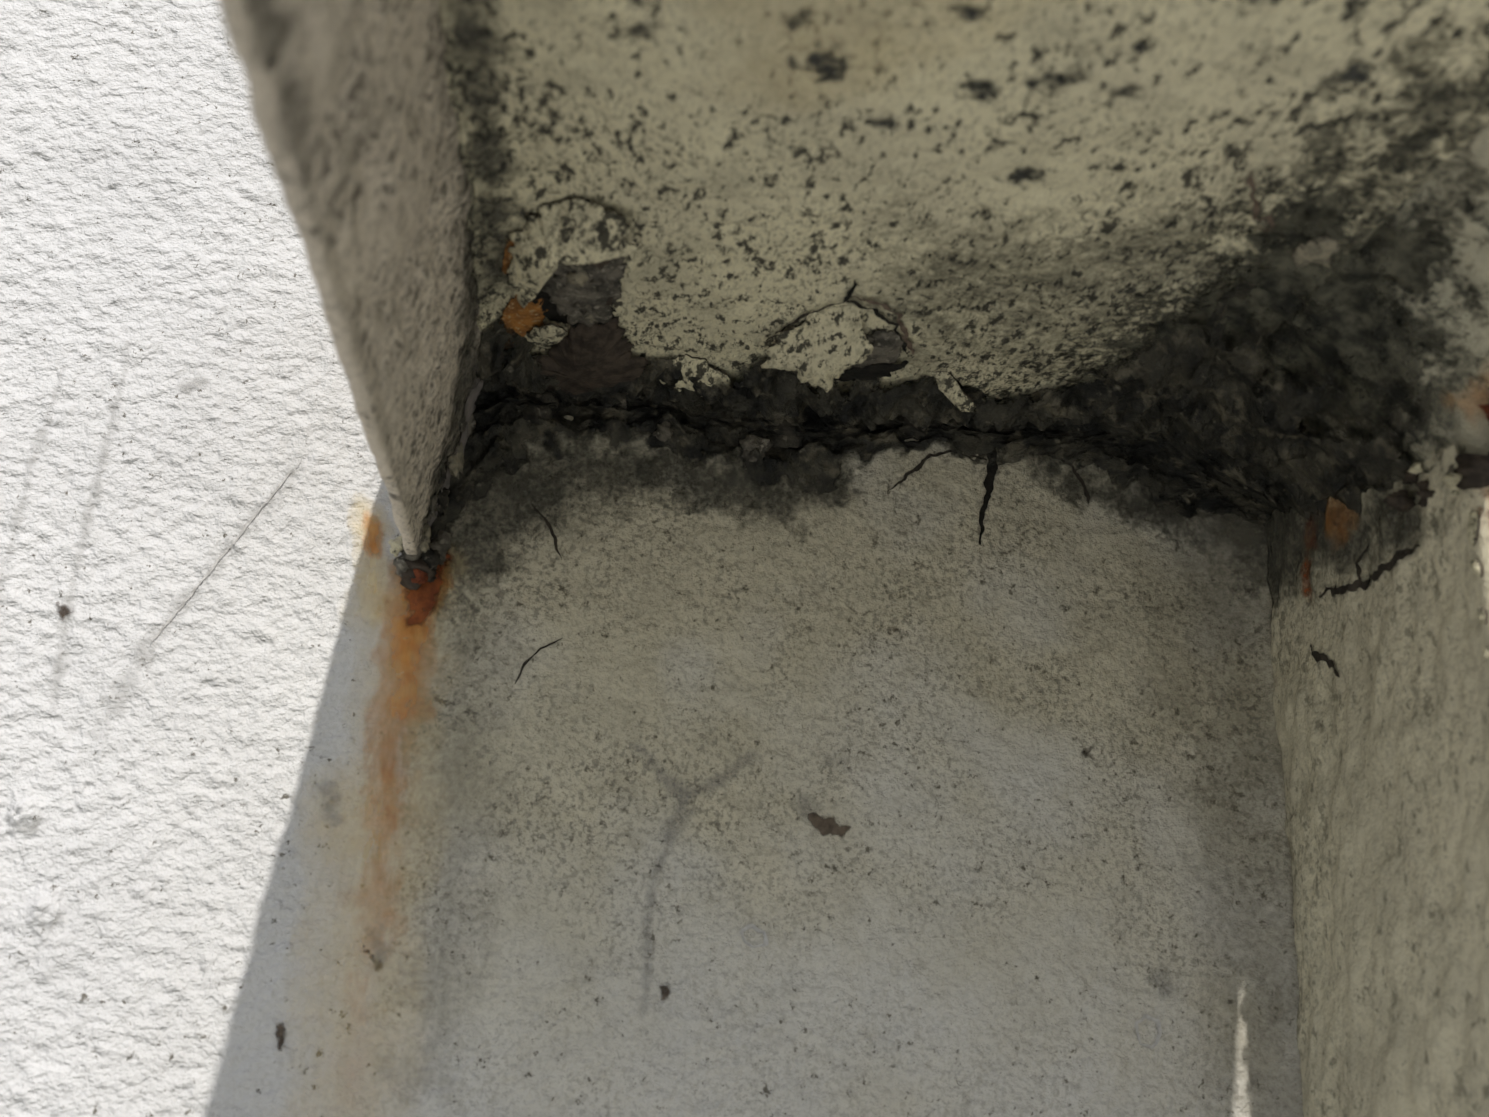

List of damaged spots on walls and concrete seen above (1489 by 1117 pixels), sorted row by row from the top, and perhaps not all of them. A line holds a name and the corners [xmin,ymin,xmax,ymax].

spalling [500,197,649,395]
spalling [760,280,915,393]
leakage [420,0,1489,623]
peeling [659,354,731,397]
peeling [931,371,976,413]
crack [887,448,998,545]
crack [1048,455,1090,503]
rust [368,521,379,554]
crack [1319,544,1420,598]
rust [390,553,453,720]
crack [1310,644,1340,677]